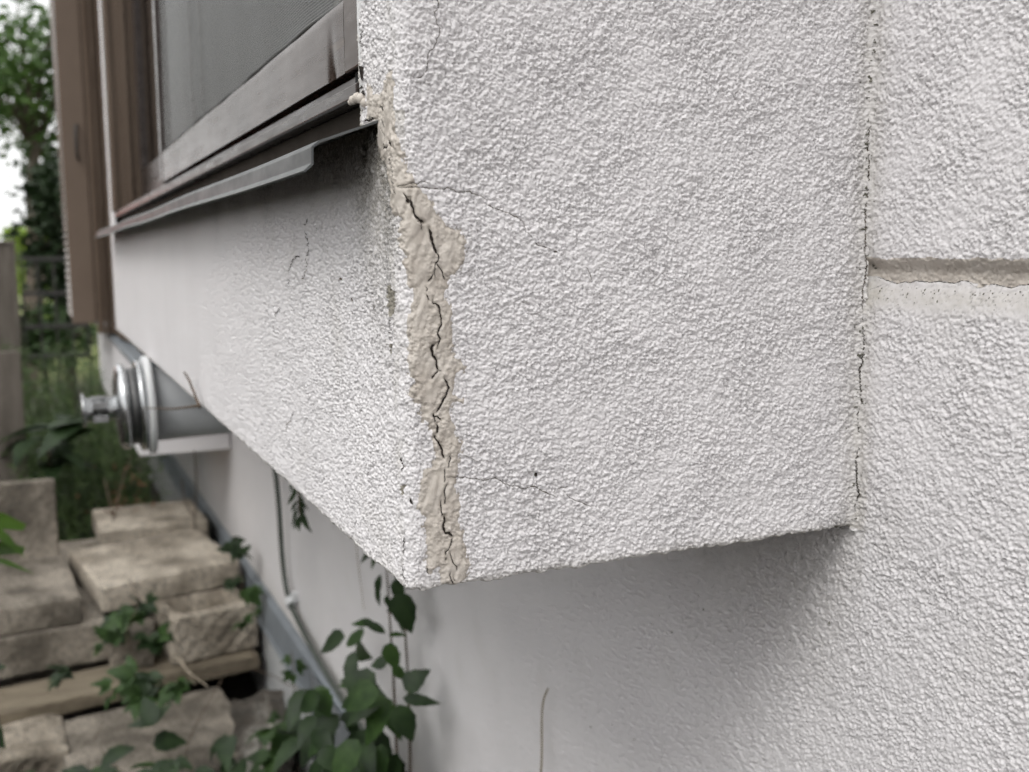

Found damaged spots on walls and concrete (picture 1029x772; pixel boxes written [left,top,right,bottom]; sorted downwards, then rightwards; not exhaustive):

crack [379,106,589,584]
crack [834,10,1029,532]